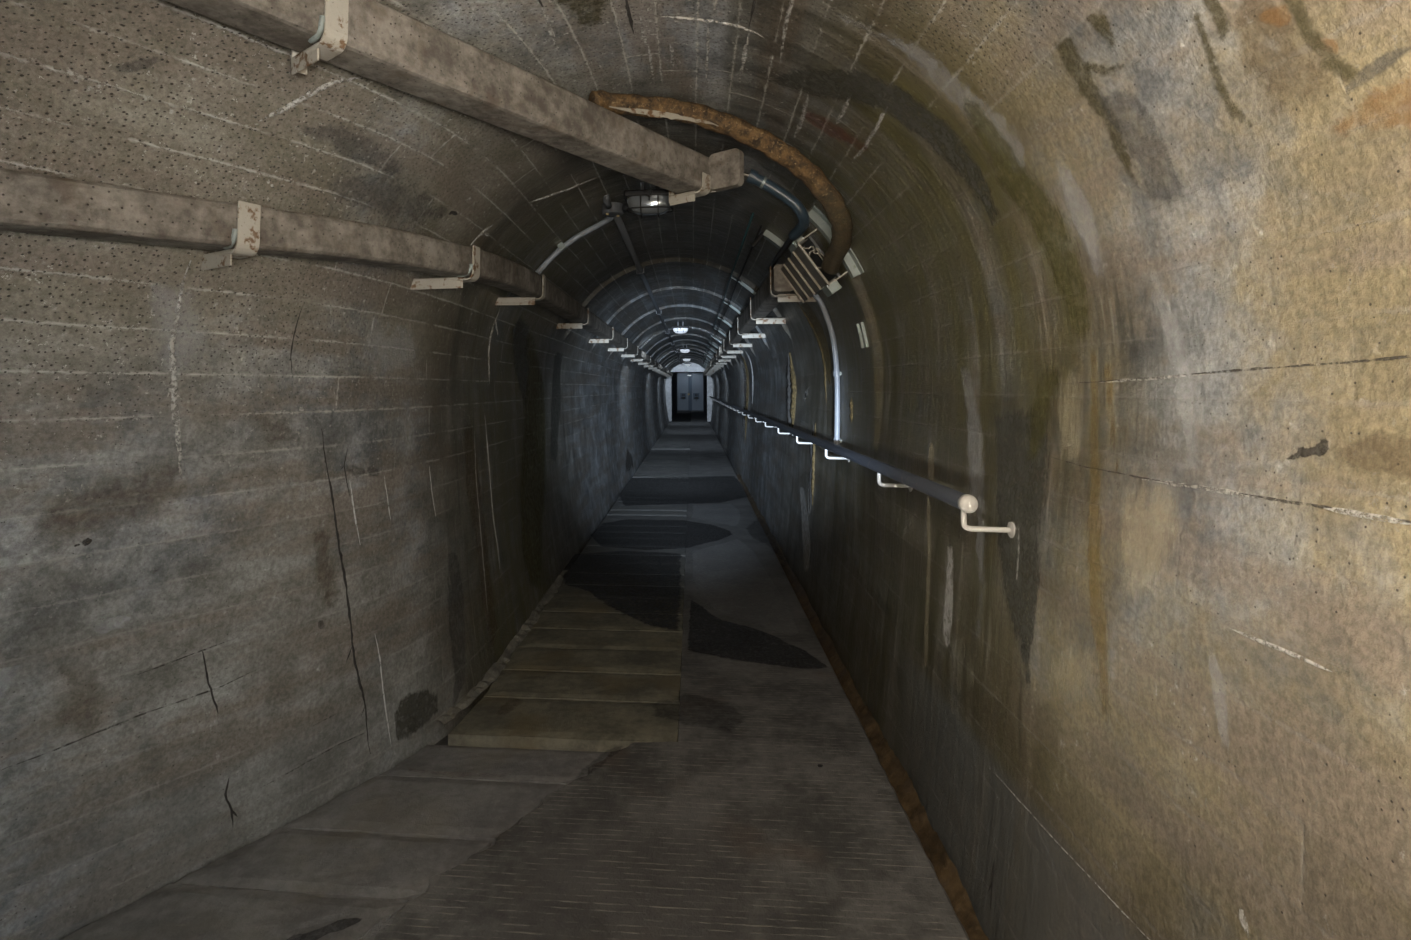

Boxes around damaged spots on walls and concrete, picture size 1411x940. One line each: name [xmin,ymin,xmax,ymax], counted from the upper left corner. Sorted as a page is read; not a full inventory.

leakage [557,0,606,26]
leakage [1087,14,1114,45]
leakage [1194,0,1244,116]
leakage [1287,0,1356,78]
leakage [1057,38,1133,178]
crack [321,429,371,754]
crack [202,651,219,714]
crack [224,778,237,825]